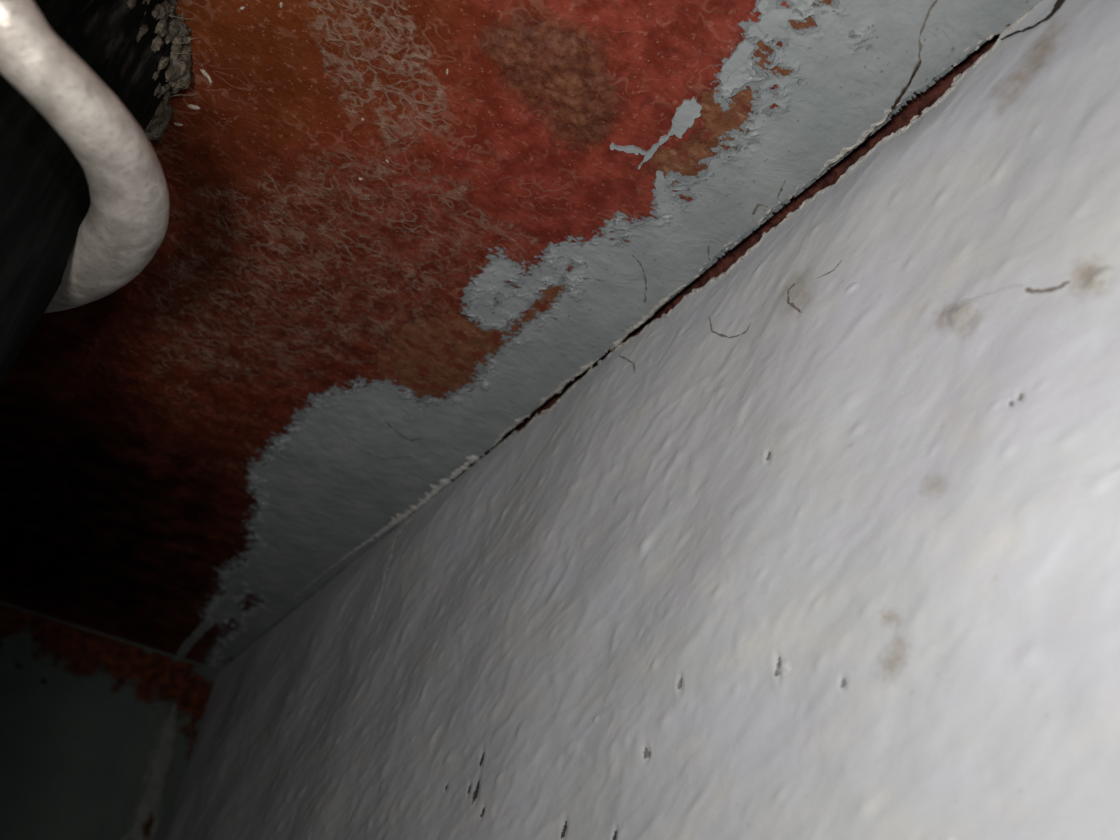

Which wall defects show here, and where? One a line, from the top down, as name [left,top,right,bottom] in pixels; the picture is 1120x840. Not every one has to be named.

peeling [176,0,1042,669]
crack [294,0,1065,621]